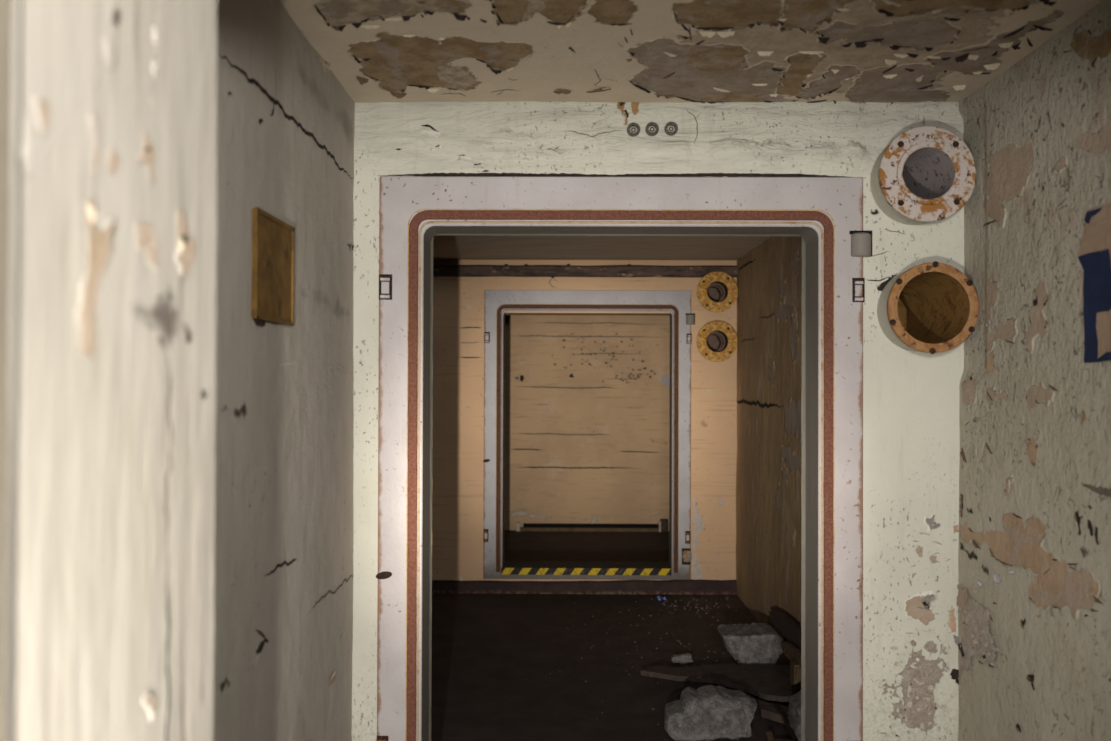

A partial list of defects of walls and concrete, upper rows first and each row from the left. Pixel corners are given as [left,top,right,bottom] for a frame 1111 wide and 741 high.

peeling [313,0,1065,105]
peeling [1063,29,1111,68]
crack [217,41,845,179]
peeling [73,197,117,360]
peeling [173,209,196,280]
crack [737,399,783,408]
corrosion [405,209,835,741]
crack [1081,483,1111,497]
crack [307,575,353,615]
peeling [924,494,1104,620]
spalling [879,577,999,741]